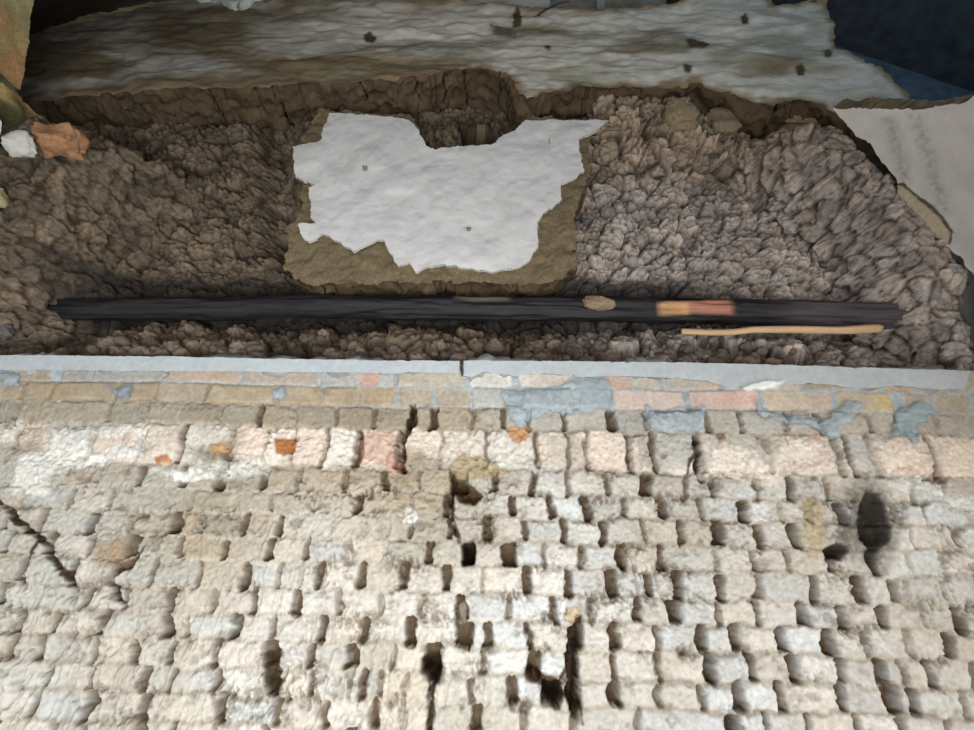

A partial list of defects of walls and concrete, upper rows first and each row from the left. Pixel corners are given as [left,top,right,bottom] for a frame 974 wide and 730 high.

spalling [661,96,743,140]
spalling [30,121,91,161]
spalling [0,188,10,208]
spalling [897,186,951,244]
crack [0,500,76,582]